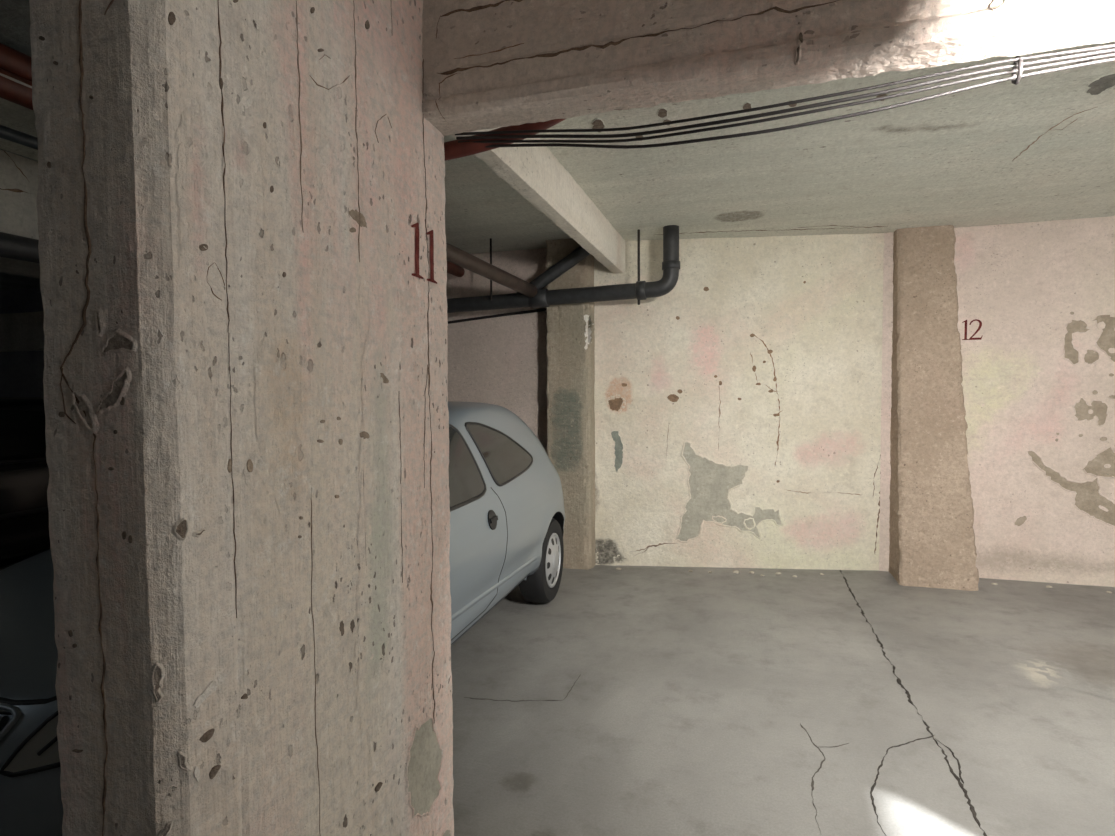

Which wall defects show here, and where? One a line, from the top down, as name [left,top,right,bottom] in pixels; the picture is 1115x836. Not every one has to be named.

crack [296,0,392,262]
crack [1013,107,1096,160]
crack [60,0,114,836]
crack [399,0,839,721]
peeling [675,441,784,543]
crack [750,334,881,553]
peeling [1027,389,1115,527]
peeling [1062,312,1115,377]
crack [311,499,321,836]
crack [800,723,848,833]
crack [840,570,987,836]